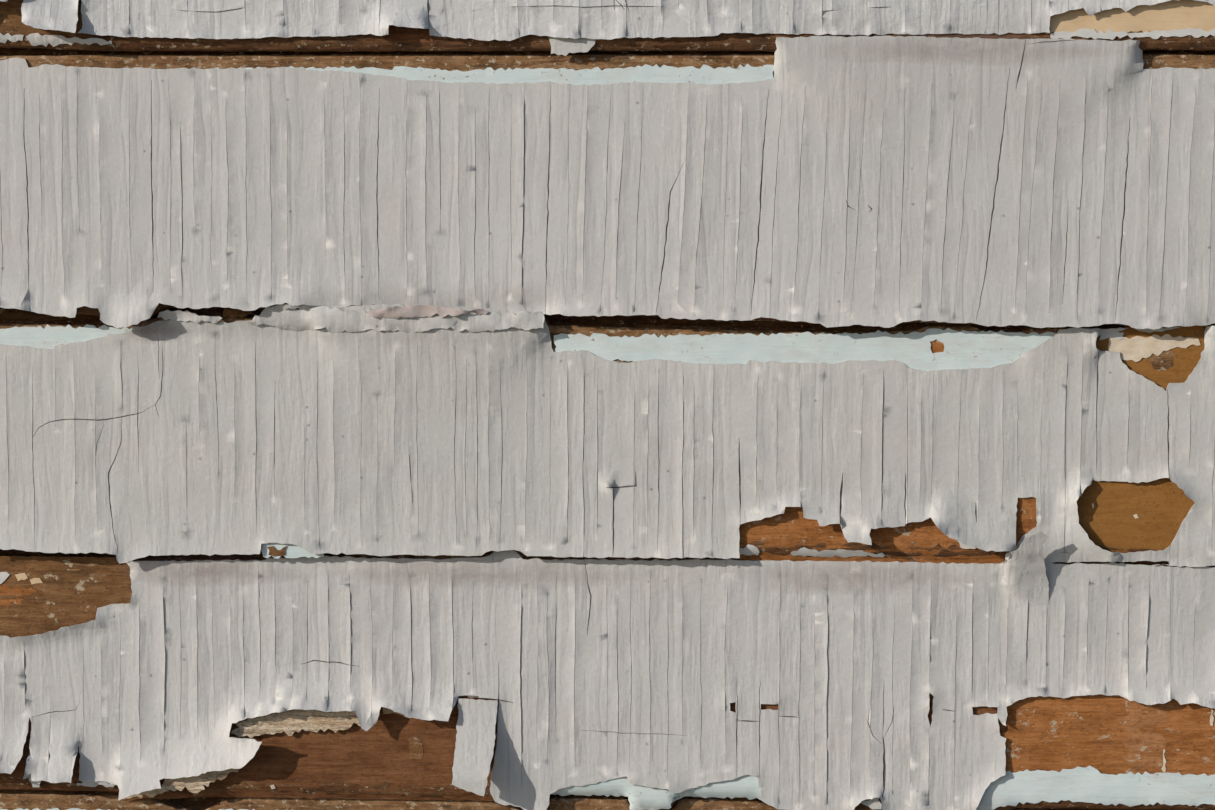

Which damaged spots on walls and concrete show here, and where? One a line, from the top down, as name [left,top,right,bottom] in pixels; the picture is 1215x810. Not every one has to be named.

peeling [1046,0,1215,40]
crack [0,89,79,282]
crack [129,88,288,288]
crack [324,0,1215,319]
peeling [554,328,1056,371]
crack [7,350,163,549]
crack [1167,390,1215,496]
crack [243,353,1195,799]
peeling [739,497,1049,608]
peeling [1077,478,1195,564]
peeling [0,696,498,810]
peeling [972,694,1215,810]